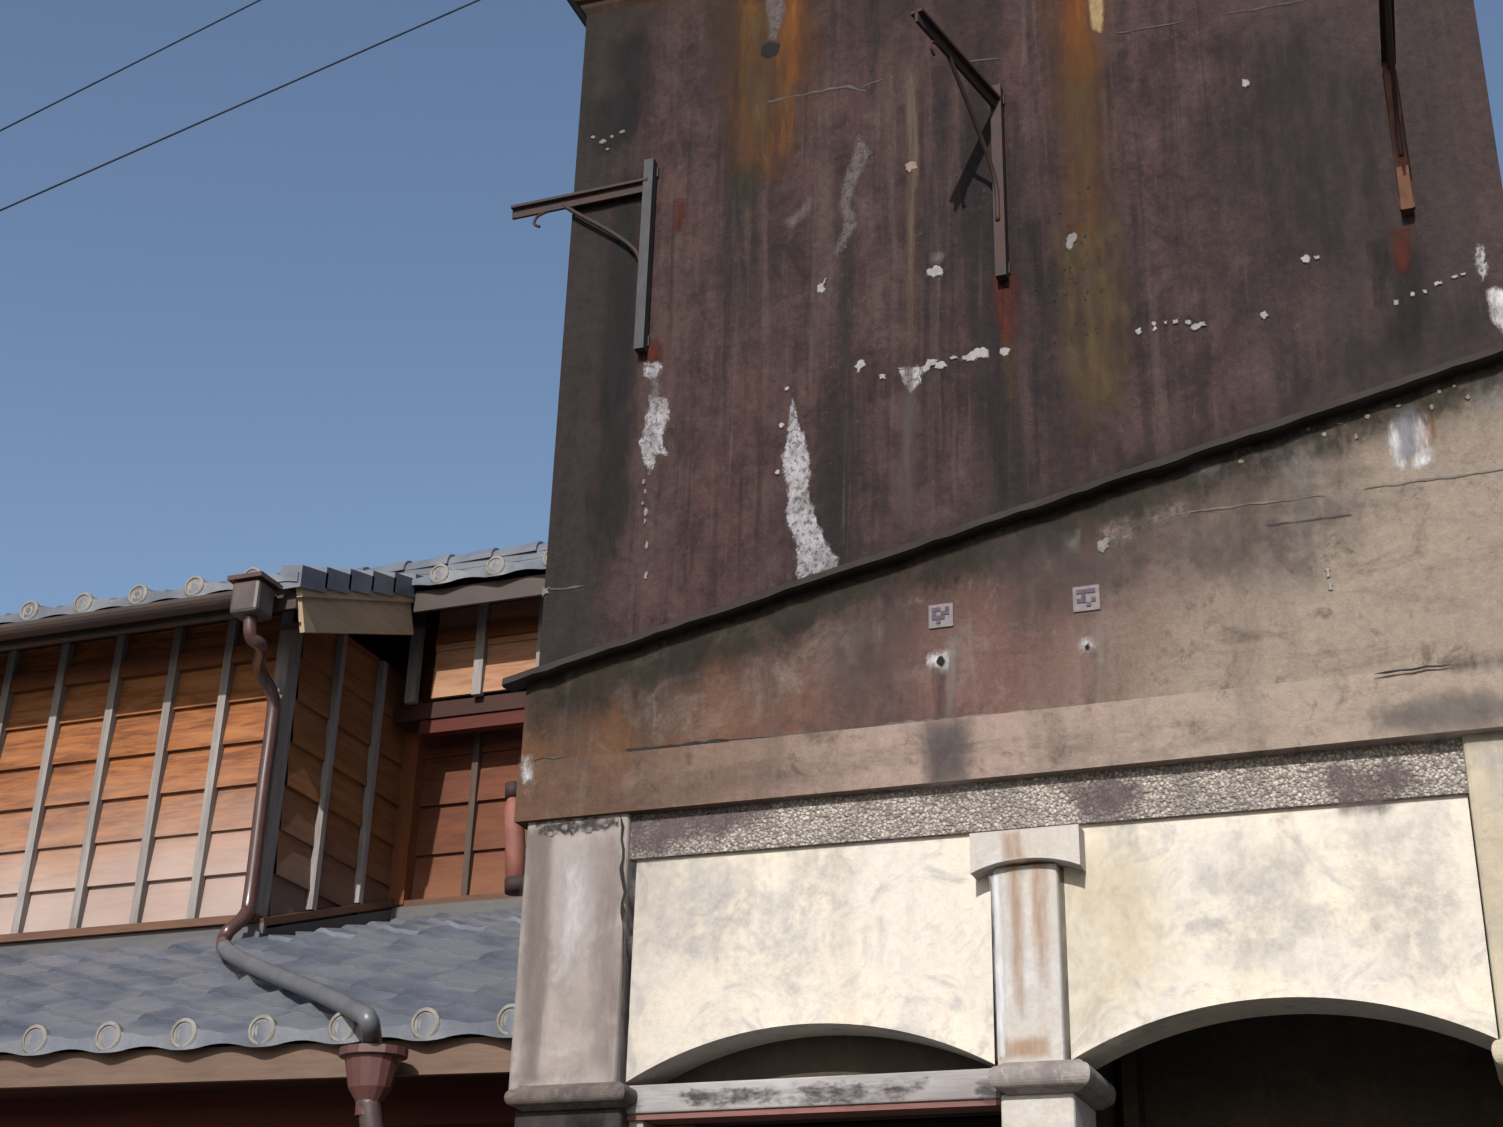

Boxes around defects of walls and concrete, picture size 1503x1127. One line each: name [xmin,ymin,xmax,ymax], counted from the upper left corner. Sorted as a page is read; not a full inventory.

peeling [1089,0,1104,32]
peeling [1393,243,1503,327]
peeling [854,347,1011,394]
peeling [639,361,670,550]
peeling [775,386,838,579]
damp [1387,696,1503,726]
damp [928,726,963,783]
damp [1329,764,1411,807]
crack [619,815,627,1031]